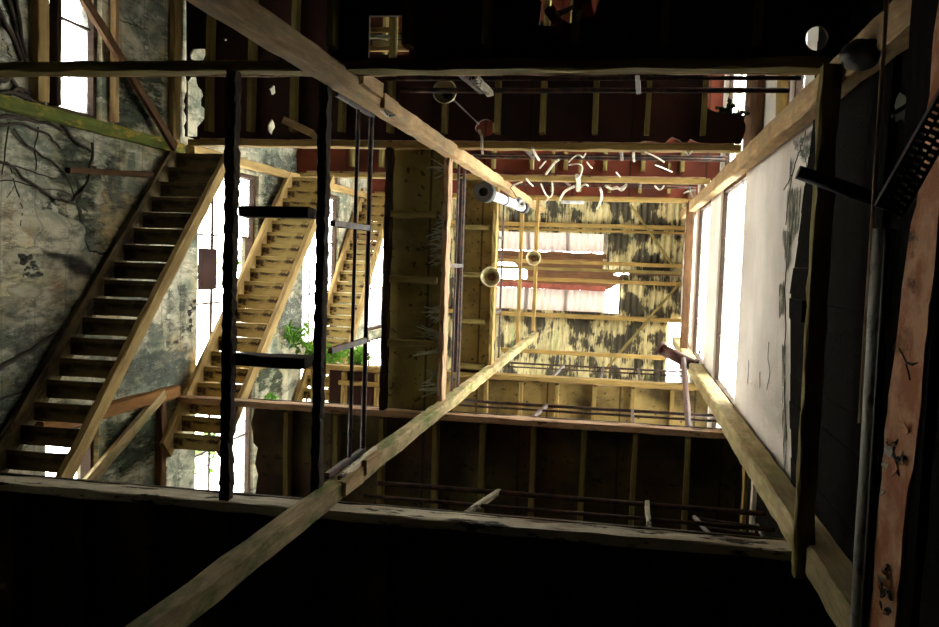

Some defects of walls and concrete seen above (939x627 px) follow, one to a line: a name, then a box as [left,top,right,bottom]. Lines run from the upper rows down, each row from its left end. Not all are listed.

water stain [782,131,812,271]